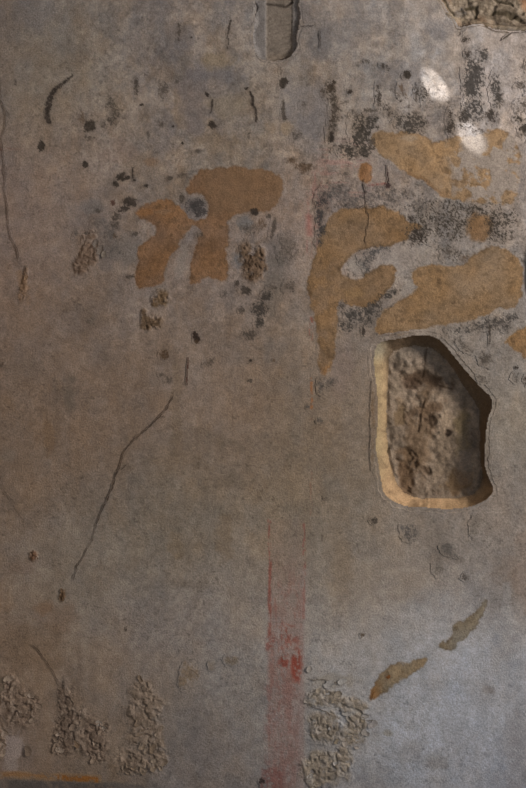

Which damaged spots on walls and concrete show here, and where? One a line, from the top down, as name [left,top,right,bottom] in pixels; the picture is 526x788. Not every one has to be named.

flaking render [246,0,308,69]
spalling [434,0,526,37]
damp [318,70,430,162]
damp [444,35,526,143]
crack [0,86,19,258]
spalling [236,237,270,288]
damp [313,181,526,265]
damp [220,278,298,341]
damp [443,312,521,385]
crack [73,392,174,580]
flaking render [437,598,489,652]
flaking render [296,656,429,788]